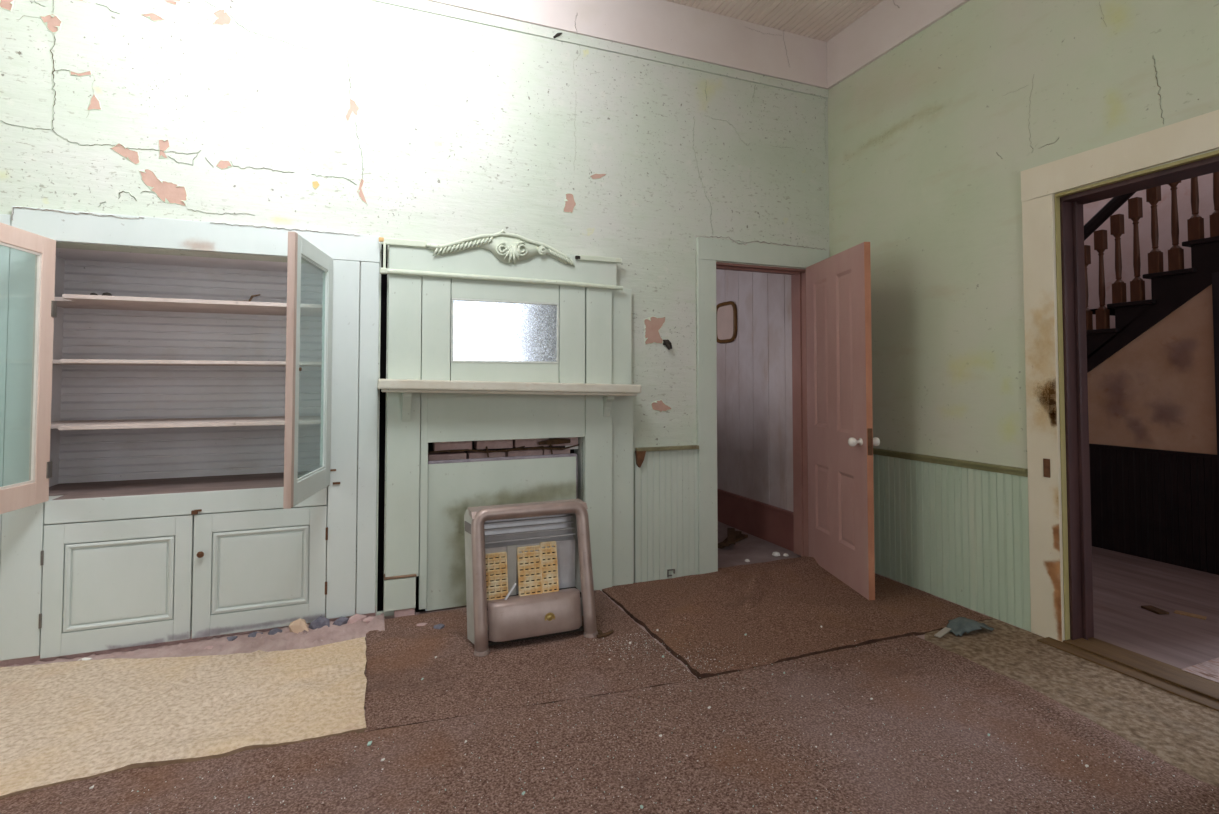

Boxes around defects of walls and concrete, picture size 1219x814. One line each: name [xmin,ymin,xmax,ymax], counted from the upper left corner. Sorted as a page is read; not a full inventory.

peeling [40,14,62,33]
peeling [87,94,102,111]
crack [0,0,363,185]
peeling [110,139,188,206]
crack [11,190,150,221]
peeling [563,193,576,213]
crack [193,210,358,236]
peeling [644,316,666,345]